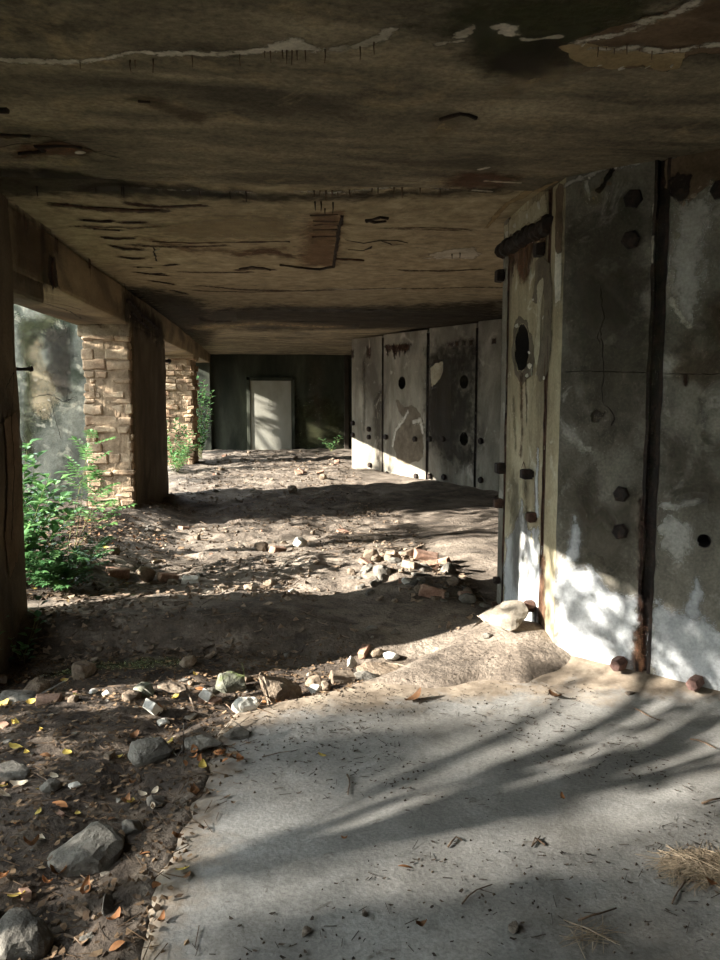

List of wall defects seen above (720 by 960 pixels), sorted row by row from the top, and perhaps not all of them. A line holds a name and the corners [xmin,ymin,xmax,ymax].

damp [476,23,565,77]
peeling [559,0,720,72]
spalling [234,201,364,271]
rust [384,343,412,359]
peeling [430,359,443,387]
rust [513,375,527,457]
rust [632,498,647,672]